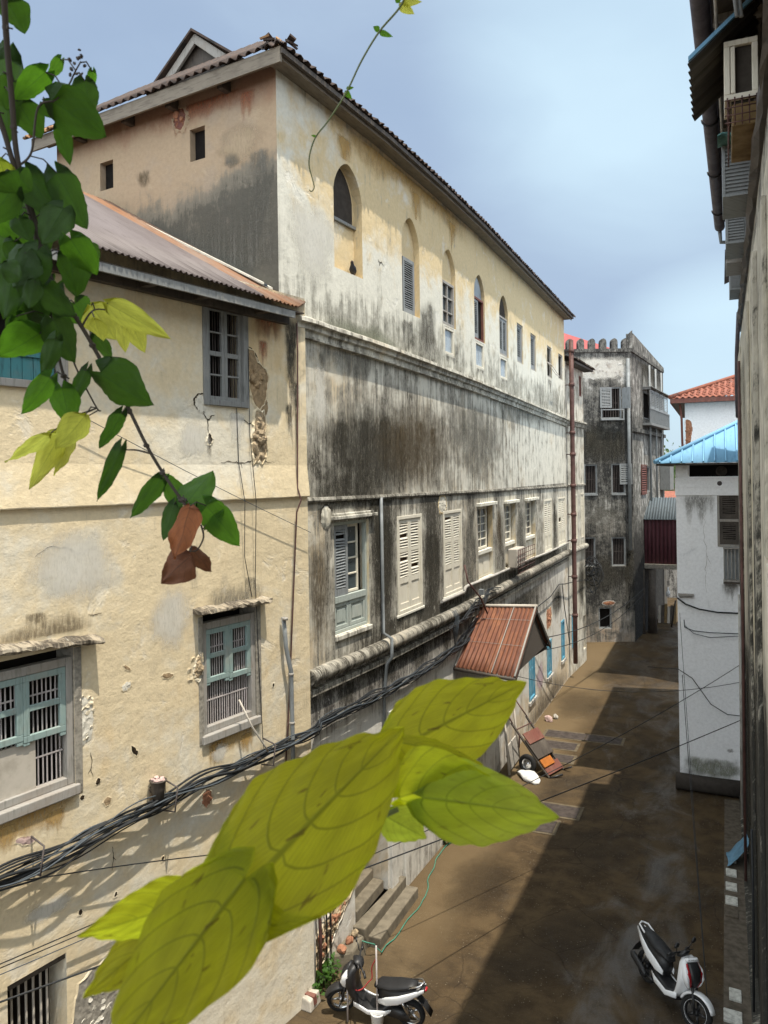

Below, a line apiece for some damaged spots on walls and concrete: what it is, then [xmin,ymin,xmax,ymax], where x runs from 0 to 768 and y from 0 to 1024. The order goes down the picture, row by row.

water stain [193,226,265,269]
flaking render [249,348,269,412]
water stain [314,351,377,423]
water stain [584,358,626,378]
crack [193,393,215,435]
water stain [584,426,627,460]
flaking render [187,653,204,683]
peeling [80,695,95,746]
peeling [71,957,119,1024]